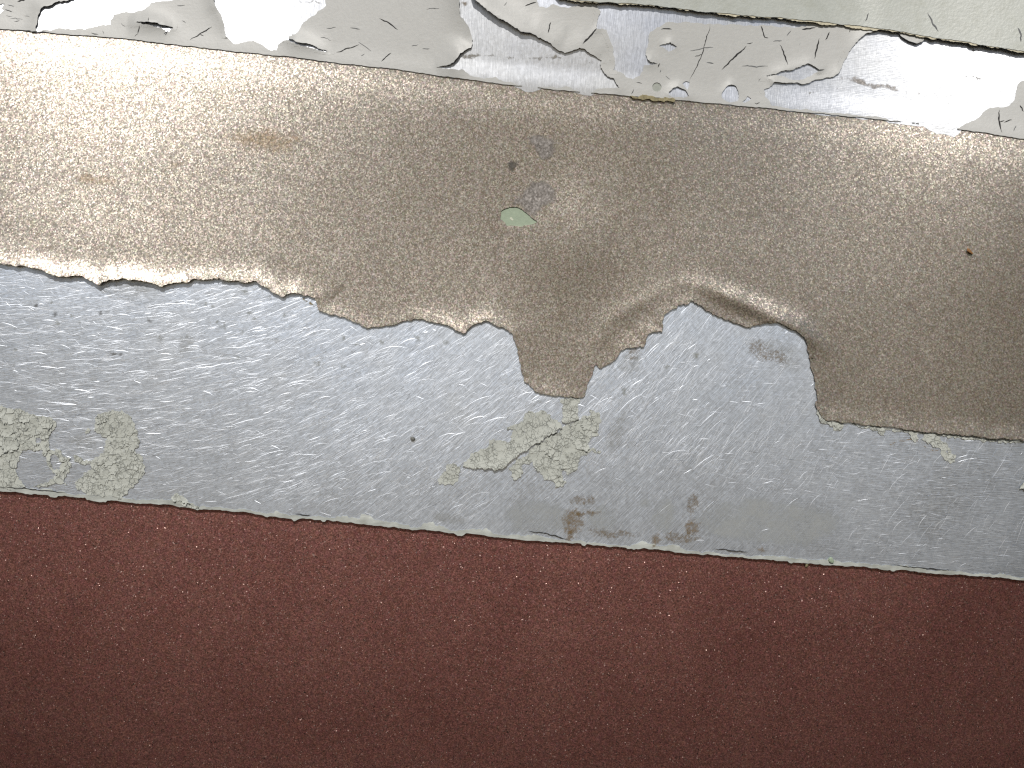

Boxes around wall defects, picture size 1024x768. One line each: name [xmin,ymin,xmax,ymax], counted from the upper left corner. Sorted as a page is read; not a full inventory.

peeling [31,0,178,34]
peeling [209,0,334,55]
peeling [436,0,806,98]
crack [632,26,850,104]
peeling [722,29,1024,137]
peeling [0,250,1024,578]